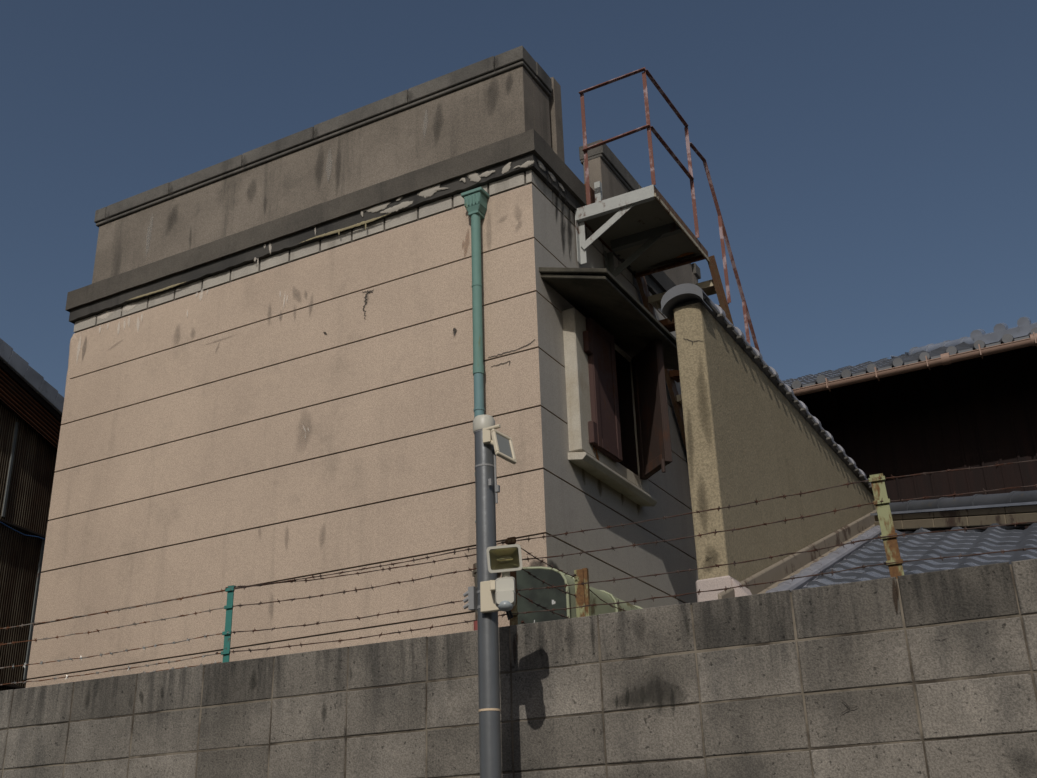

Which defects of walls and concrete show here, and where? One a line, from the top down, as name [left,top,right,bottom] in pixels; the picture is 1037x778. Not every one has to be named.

peeling [460,160,567,202]
peeling [301,184,448,243]
leakage [556,198,572,256]
crack [362,289,374,319]